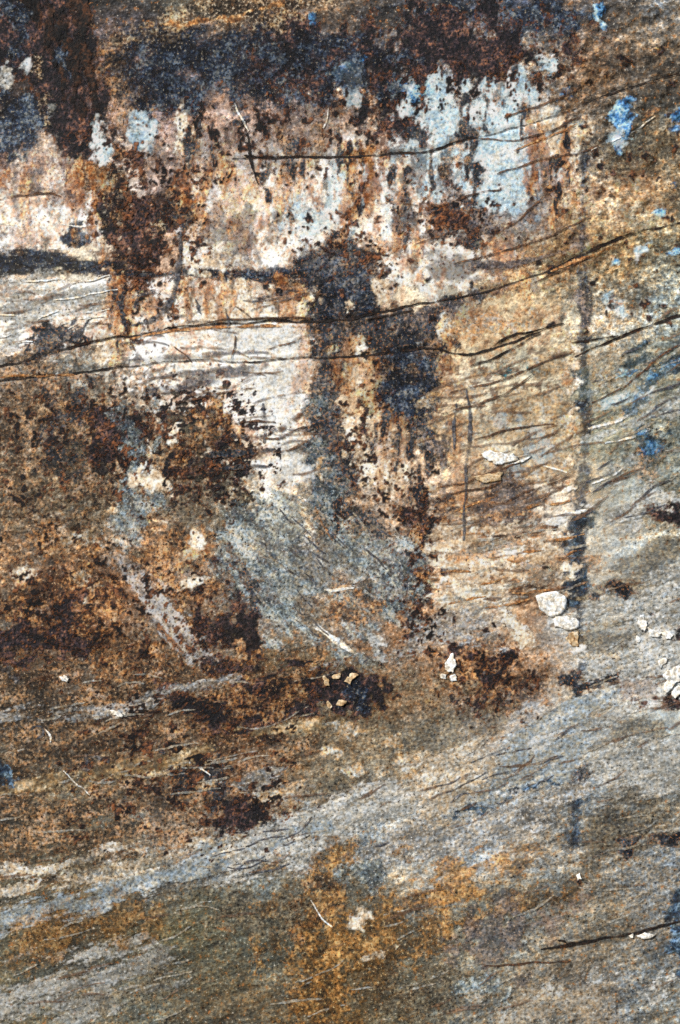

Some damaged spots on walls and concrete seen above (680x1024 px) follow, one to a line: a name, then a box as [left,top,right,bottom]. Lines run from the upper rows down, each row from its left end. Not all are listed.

crack [0,192,72,200]
rust [0,0,626,862]
crack [0,215,680,875]
rust [249,836,540,1024]
crack [400,884,680,1015]